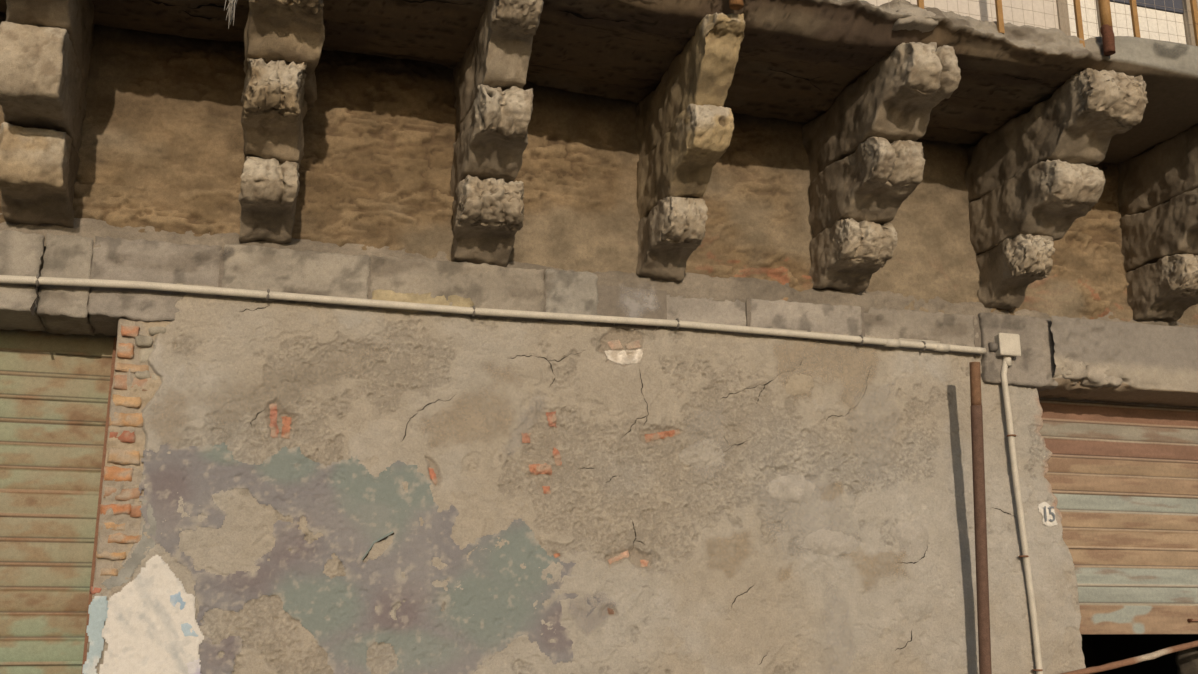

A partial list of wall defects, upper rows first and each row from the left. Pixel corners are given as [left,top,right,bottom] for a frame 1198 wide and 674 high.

spalling [604,339,644,365]
crack [623,369,649,437]
peeling [139,403,614,674]
peeling [82,596,109,674]